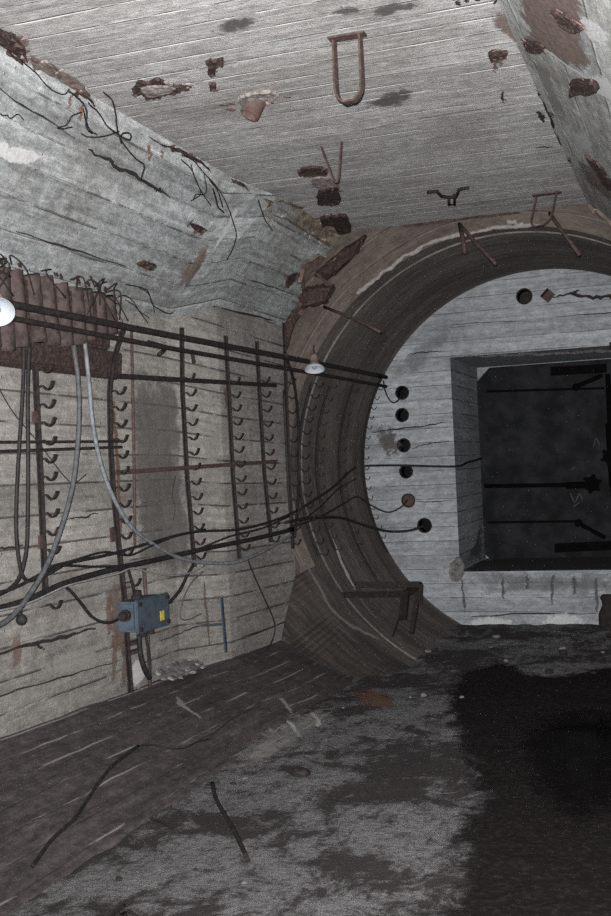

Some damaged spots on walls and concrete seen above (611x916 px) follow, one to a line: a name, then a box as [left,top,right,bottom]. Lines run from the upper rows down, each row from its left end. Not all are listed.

spalling [0,29,96,120]
spalling [131,77,197,101]
spalling [205,57,225,92]
spalling [488,49,509,72]
peeling [519,0,600,98]
crack [0,88,170,198]
spalling [585,153,611,191]
spalling [264,165,381,350]
crack [553,290,611,317]